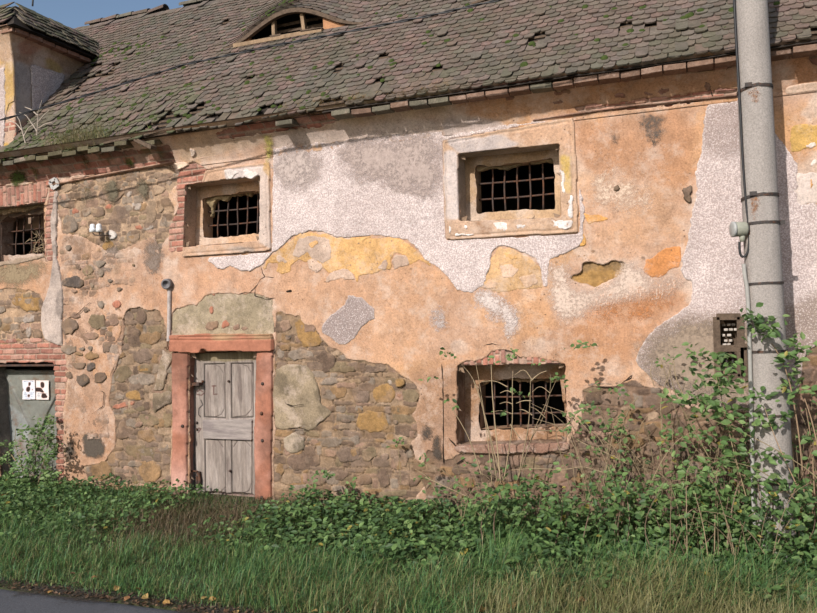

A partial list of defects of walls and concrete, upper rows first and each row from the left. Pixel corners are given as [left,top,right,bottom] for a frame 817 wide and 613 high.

mould [641,115,663,144]
peeling [790,124,817,152]
spalling [0,145,207,262]
peeling [224,169,259,179]
peeling [475,159,608,231]
flaking render [62,276,84,288]
peeling [263,232,431,292]
peeling [481,247,542,293]
spalling [571,234,624,287]
peeling [629,246,681,278]
flaking render [0,288,90,484]
spalling [83,293,751,516]